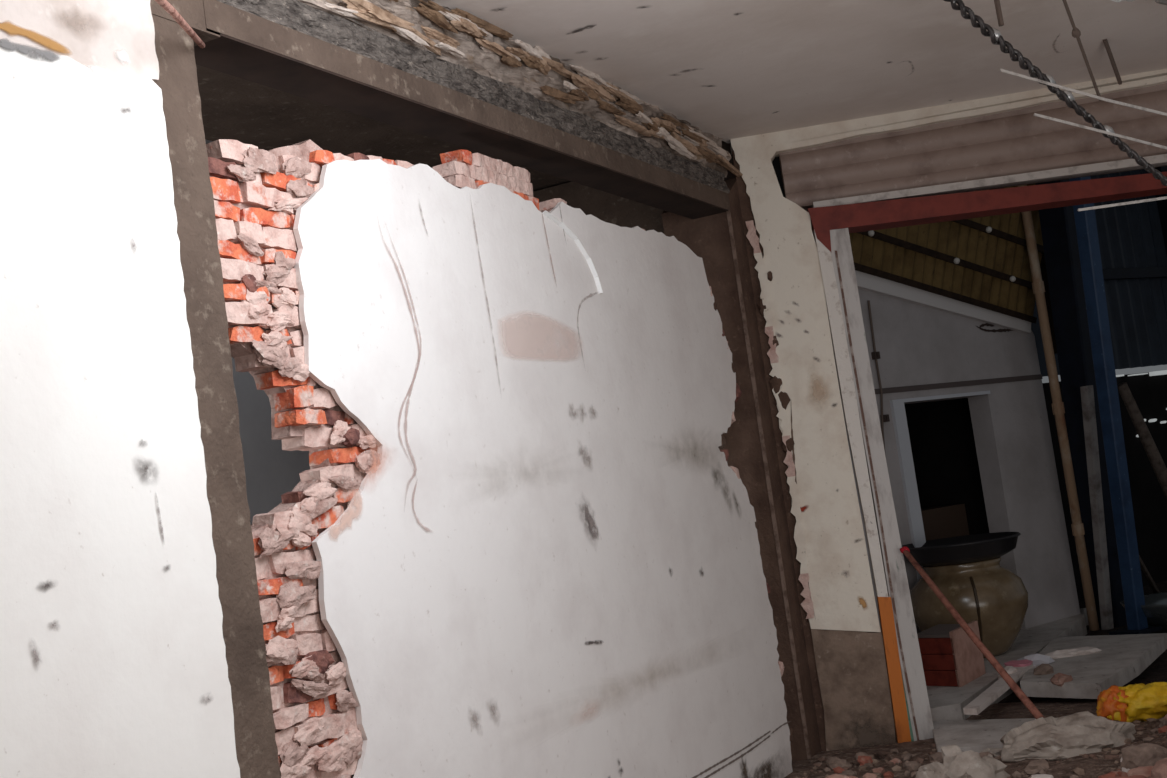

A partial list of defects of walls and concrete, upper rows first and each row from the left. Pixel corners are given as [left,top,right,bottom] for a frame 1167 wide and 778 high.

flaking render [298,0,743,178]
flaking render [206,139,413,778]
crack [390,253,429,531]
flaking render [745,220,814,619]